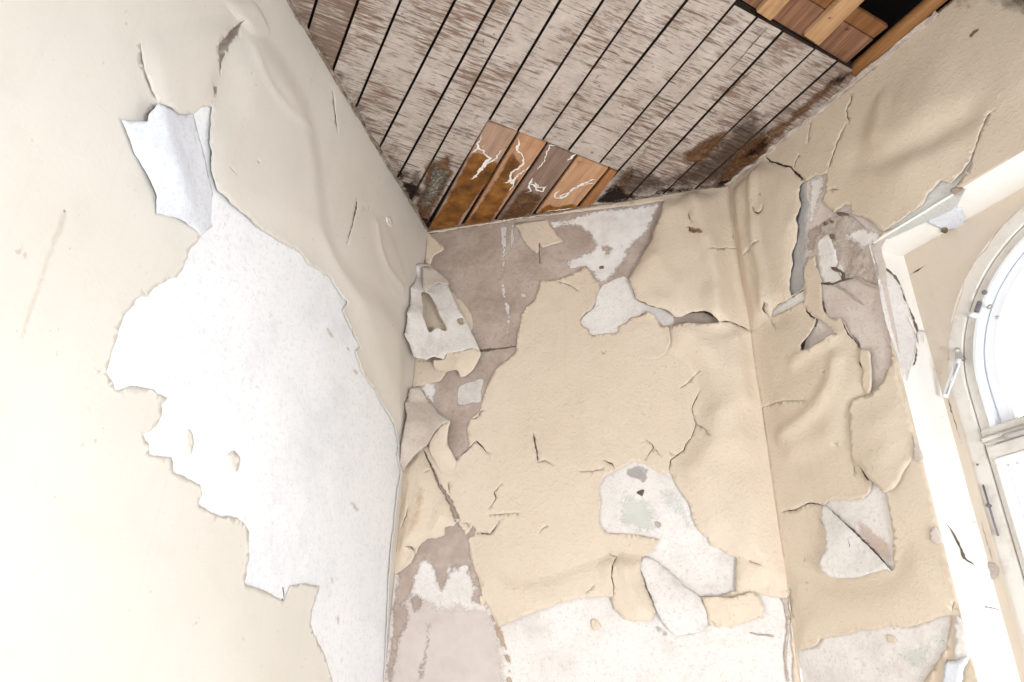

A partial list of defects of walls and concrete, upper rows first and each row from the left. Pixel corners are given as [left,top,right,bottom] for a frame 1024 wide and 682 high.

damp [389,138,596,230]
damp [597,73,850,203]
peeling [106,106,974,682]
crack [648,376,709,467]
crack [423,449,511,534]